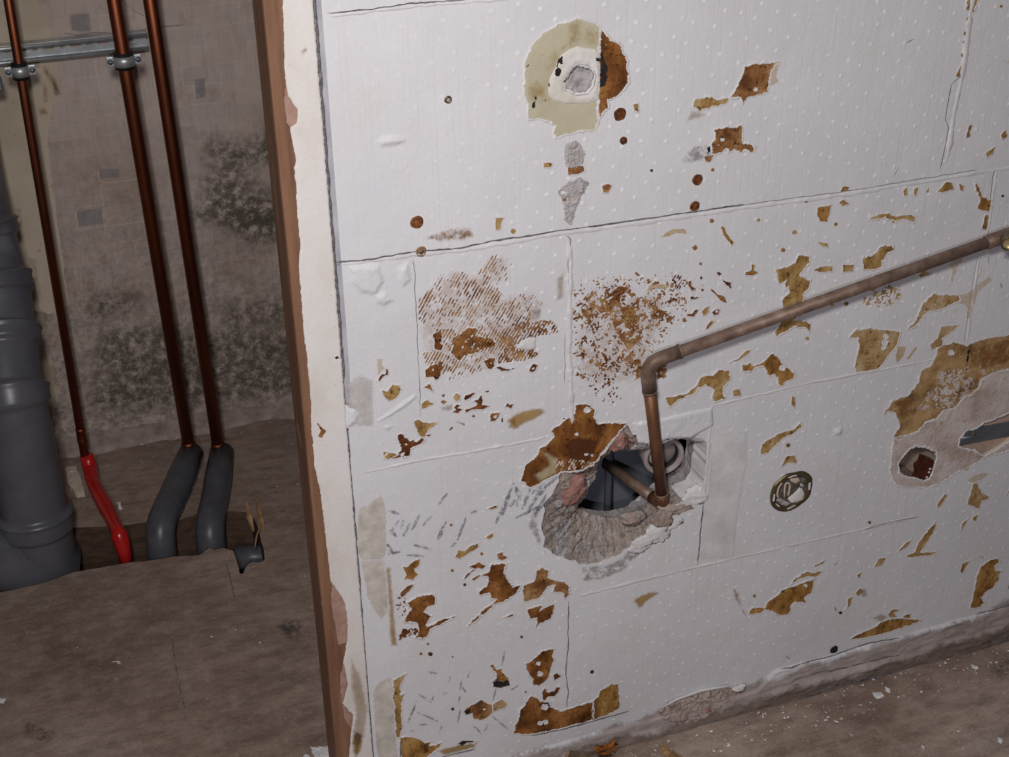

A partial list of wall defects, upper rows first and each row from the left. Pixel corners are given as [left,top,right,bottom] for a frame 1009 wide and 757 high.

peeling [522,15,631,225]
peeling [691,60,780,117]
mould [208,175,274,236]
mould [98,330,174,406]
mould [209,335,289,401]
rust [418,254,558,382]
rust [569,273,703,403]
peeling [848,258,1009,558]
spalling [519,401,709,580]
peeling [387,558,456,656]
peeling [451,532,572,628]
peeling [451,648,621,736]